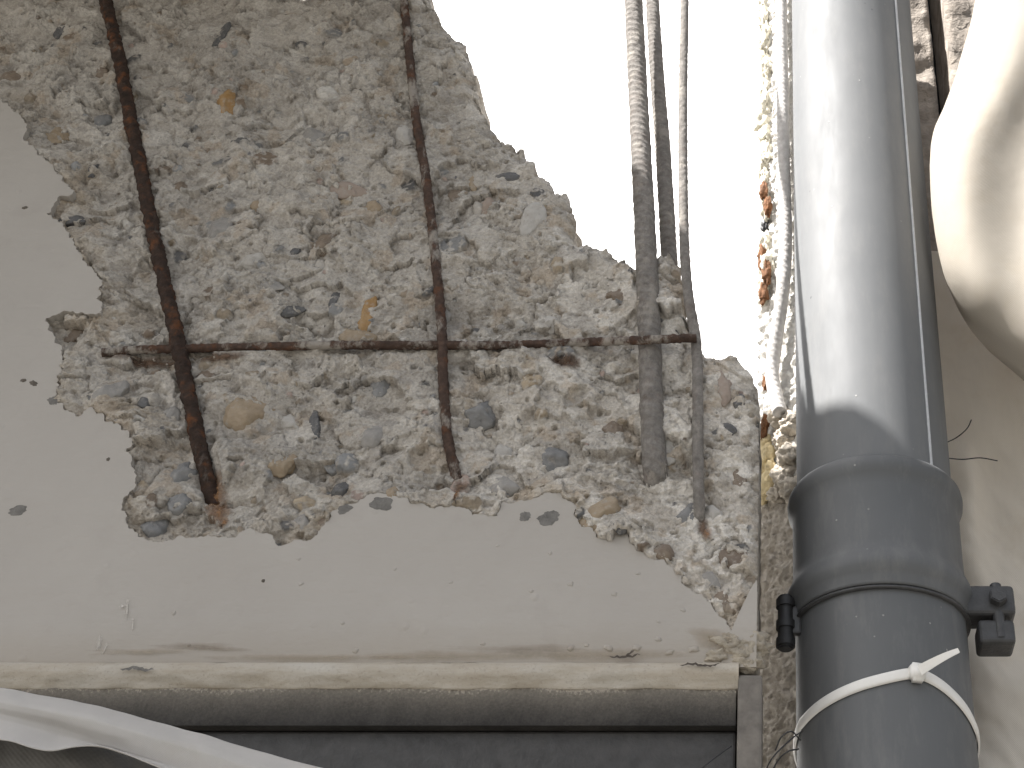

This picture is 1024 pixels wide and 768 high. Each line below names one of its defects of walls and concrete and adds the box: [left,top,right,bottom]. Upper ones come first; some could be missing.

rust [759,180,773,218]
rust [757,244,772,306]
rust [118,354,175,368]
spalling [0,0,775,676]